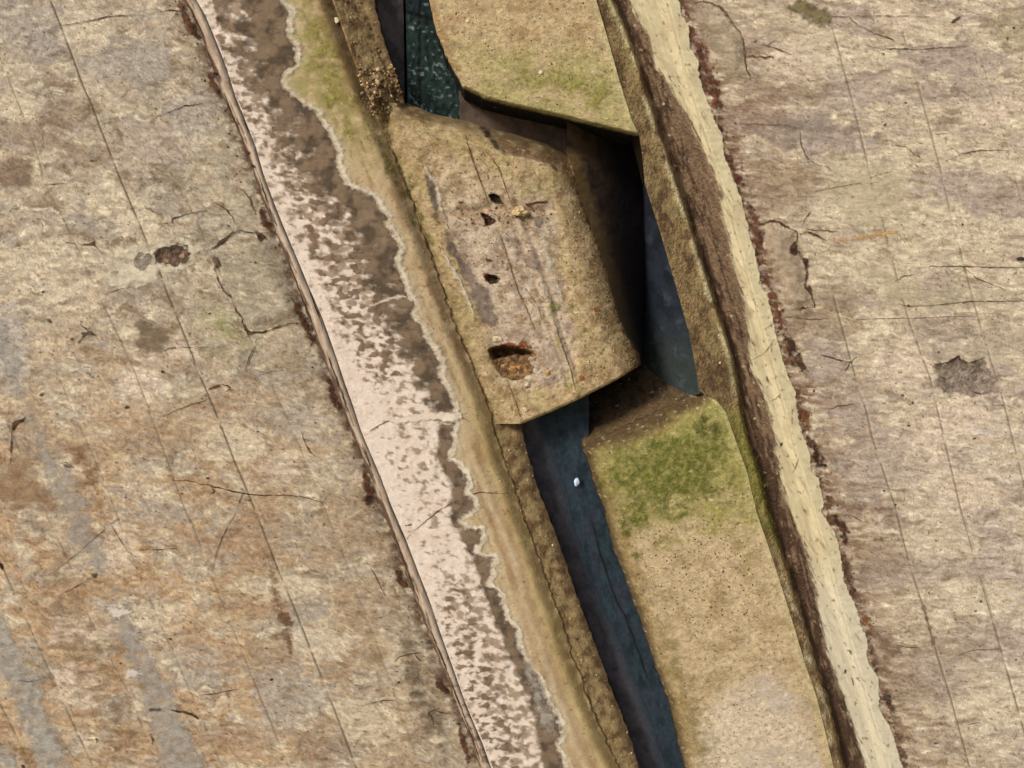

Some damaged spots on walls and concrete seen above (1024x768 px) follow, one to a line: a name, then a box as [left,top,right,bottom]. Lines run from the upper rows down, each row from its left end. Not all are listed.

rust [685,11,723,109]
crack [694,0,789,77]
rust [717,124,745,186]
spalling [134,243,199,270]
rust [746,202,806,371]
leakage [212,0,568,768]
spalling [489,336,550,387]
spalling [934,351,997,397]
crack [174,480,330,566]